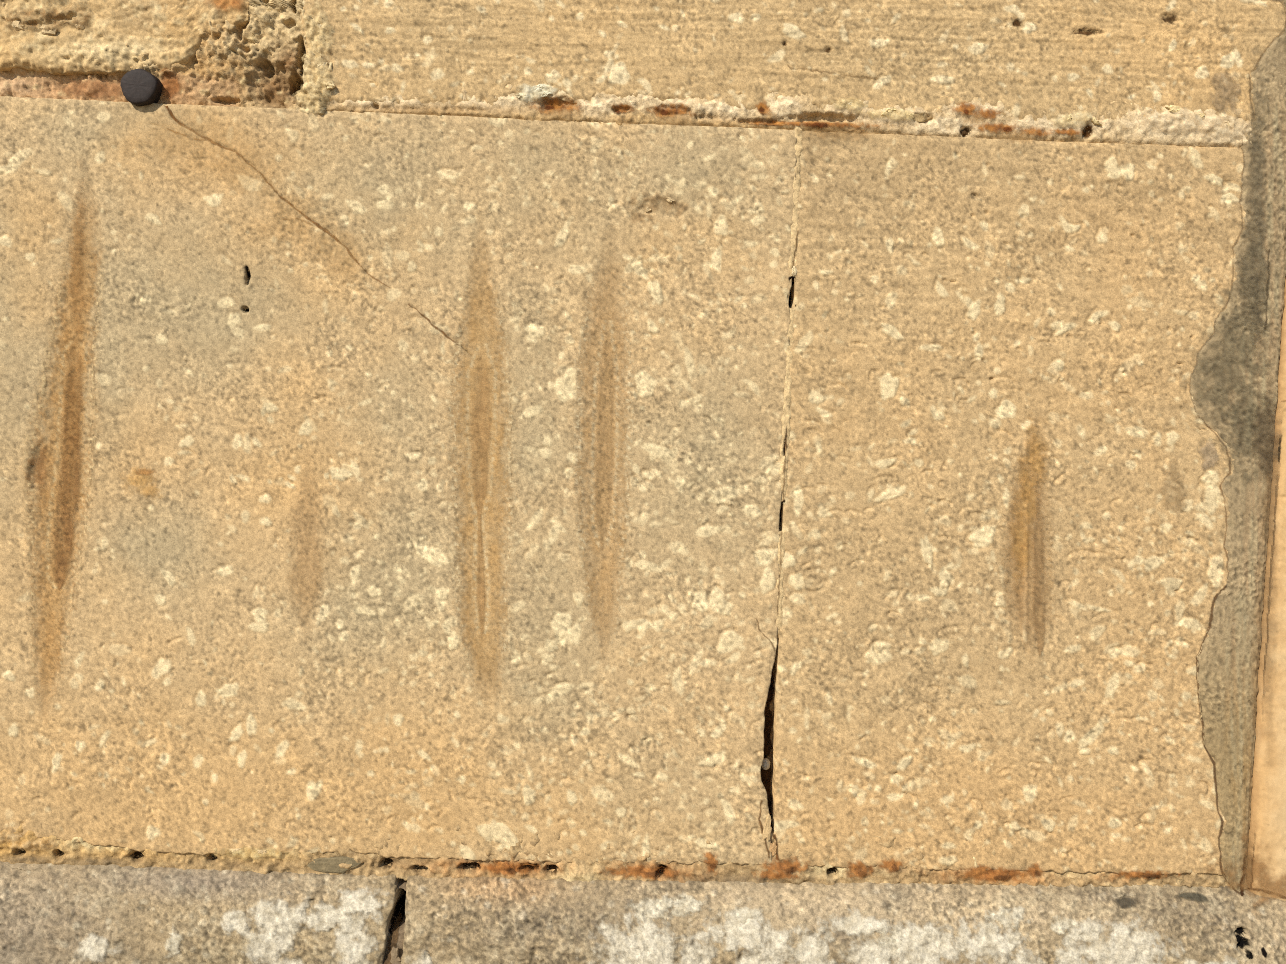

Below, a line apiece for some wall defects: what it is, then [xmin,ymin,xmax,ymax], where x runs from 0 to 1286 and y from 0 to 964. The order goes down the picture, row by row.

corrosion [534,97,580,113]
corrosion [614,103,687,117]
corrosion [955,103,1080,136]
crack [165,106,374,278]
crack [787,233,798,307]
leakage [1196,121,1281,471]
crack [778,426,787,589]
crack [757,621,779,860]
corrosion [487,862,536,874]
corrosion [849,859,902,877]
corrosion [963,864,1041,882]
crack [384,890,406,964]